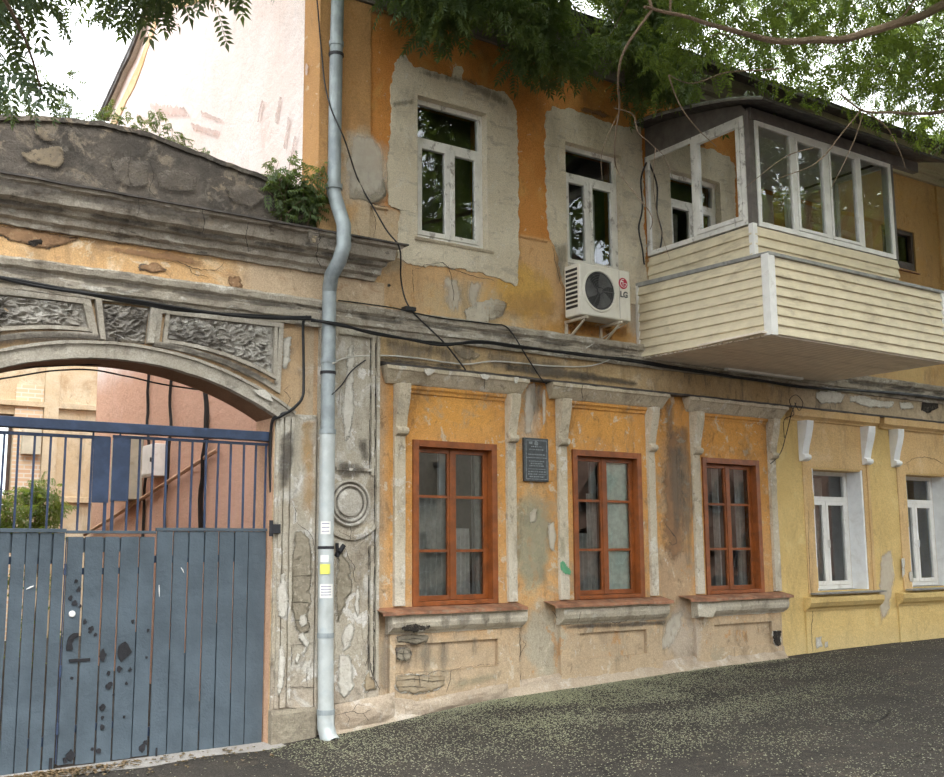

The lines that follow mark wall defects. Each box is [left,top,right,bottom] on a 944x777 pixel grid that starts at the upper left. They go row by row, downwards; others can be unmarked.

flaking render [136,101,223,137]
flaking render [21,127,64,168]
flaking render [111,157,197,192]
flaking render [342,176,386,203]
flaking render [0,226,78,250]
flaking render [138,262,167,273]
flaking render [464,298,507,322]
flaking render [339,345,355,442]
flaking render [816,390,939,413]
damp [663,432,685,559]
flaking render [277,529,313,695]
flaking render [334,552,377,697]